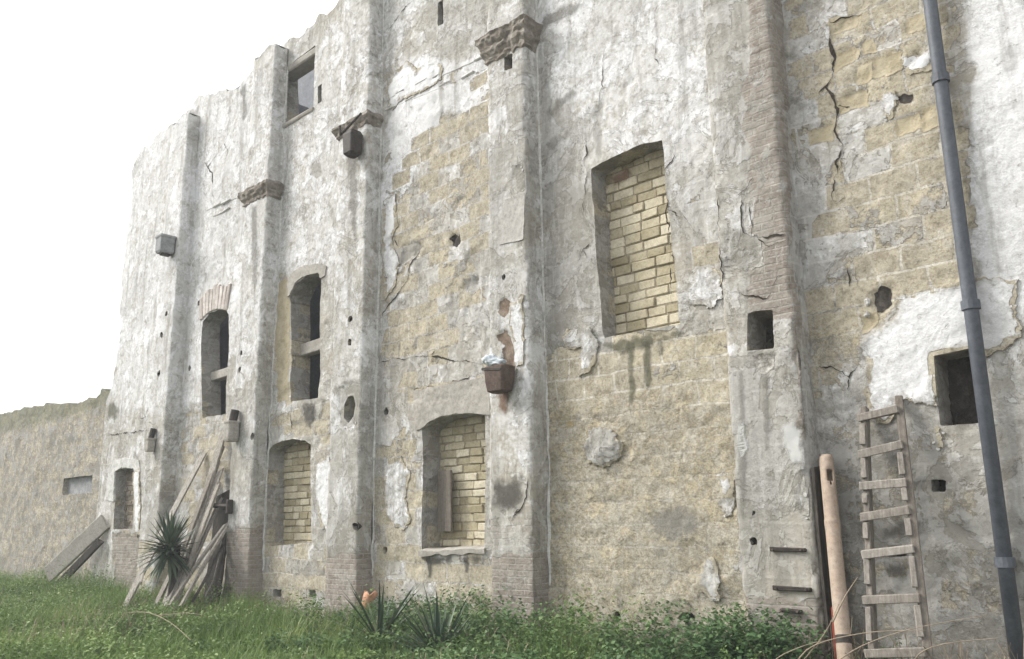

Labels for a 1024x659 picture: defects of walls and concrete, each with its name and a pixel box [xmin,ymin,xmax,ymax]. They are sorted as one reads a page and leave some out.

crack [819,5,870,204]
spalling [808,38,939,146]
flaking render [381,193,423,300]
crack [382,239,423,315]
flaking render [497,294,525,366]
water stain [626,341,663,402]
crack [717,177,792,311]
crack [823,366,858,389]
flaking render [860,281,969,424]
flaking render [975,276,1023,357]
flaking render [383,456,411,530]
water stain [494,482,520,508]